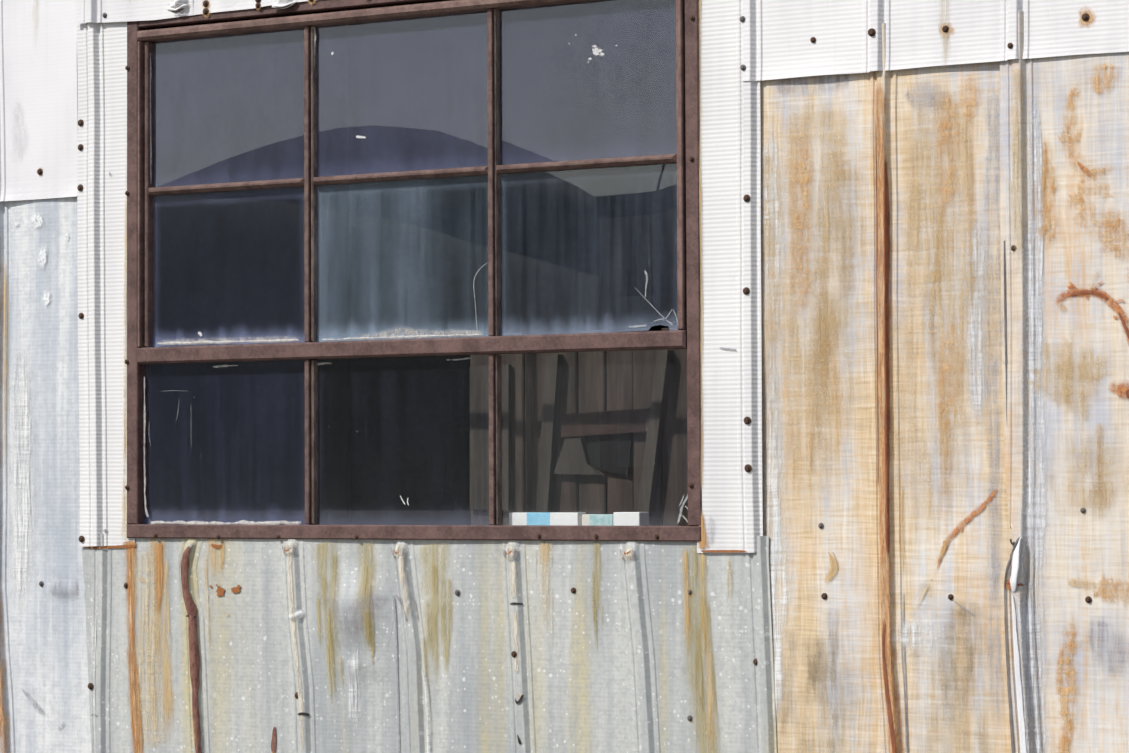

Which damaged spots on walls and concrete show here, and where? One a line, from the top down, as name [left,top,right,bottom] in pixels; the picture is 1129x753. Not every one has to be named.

corrosion [1061,88,1125,255]
corrosion [787,111,844,470]
corrosion [908,83,976,455]
corrosion [1057,281,1129,342]
corrosion [1111,383,1129,398]
corrosion [84,469,241,753]
corrosion [318,543,342,693]
corrosion [360,543,374,655]
corrosion [921,490,996,599]
water stain [348,651,359,717]
corrosion [1057,628,1077,749]